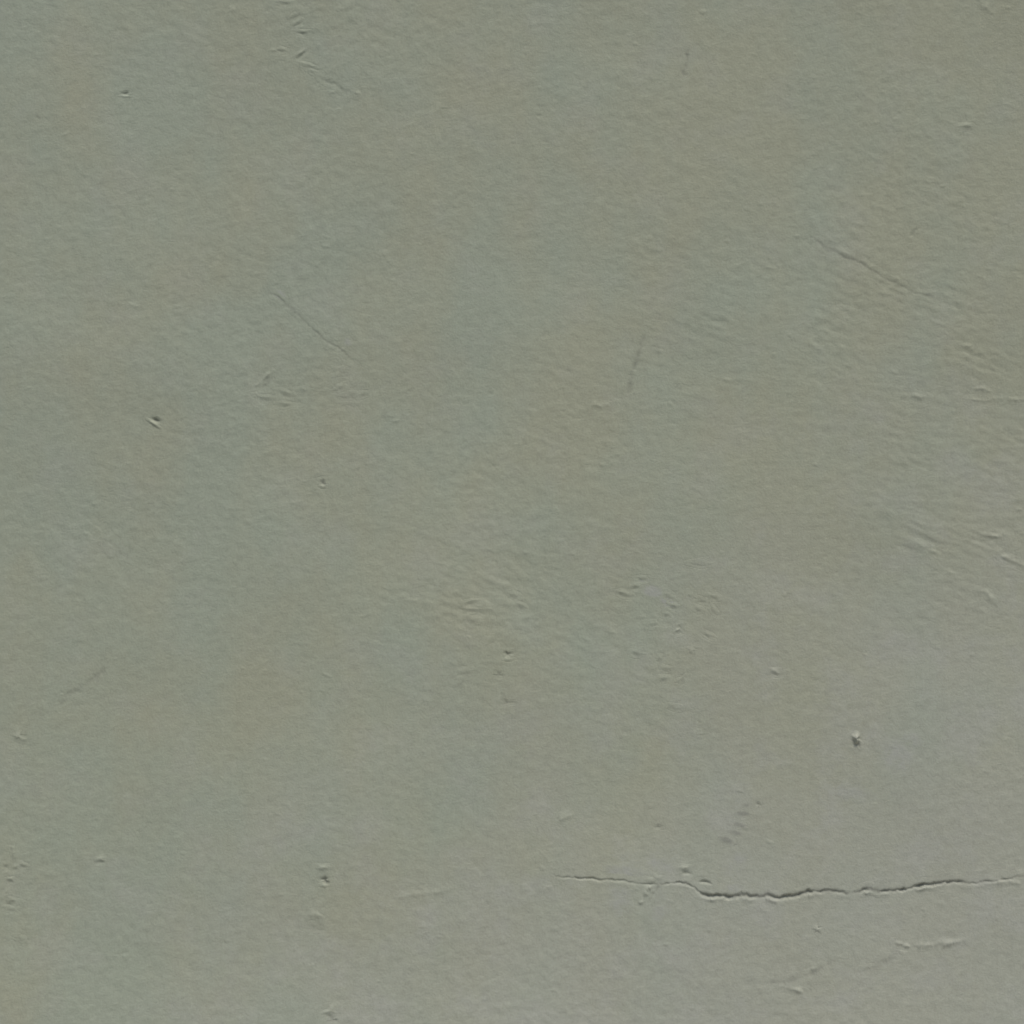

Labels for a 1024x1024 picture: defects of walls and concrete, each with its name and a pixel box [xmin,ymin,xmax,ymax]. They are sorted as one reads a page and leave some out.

crack [541,863,1024,912]